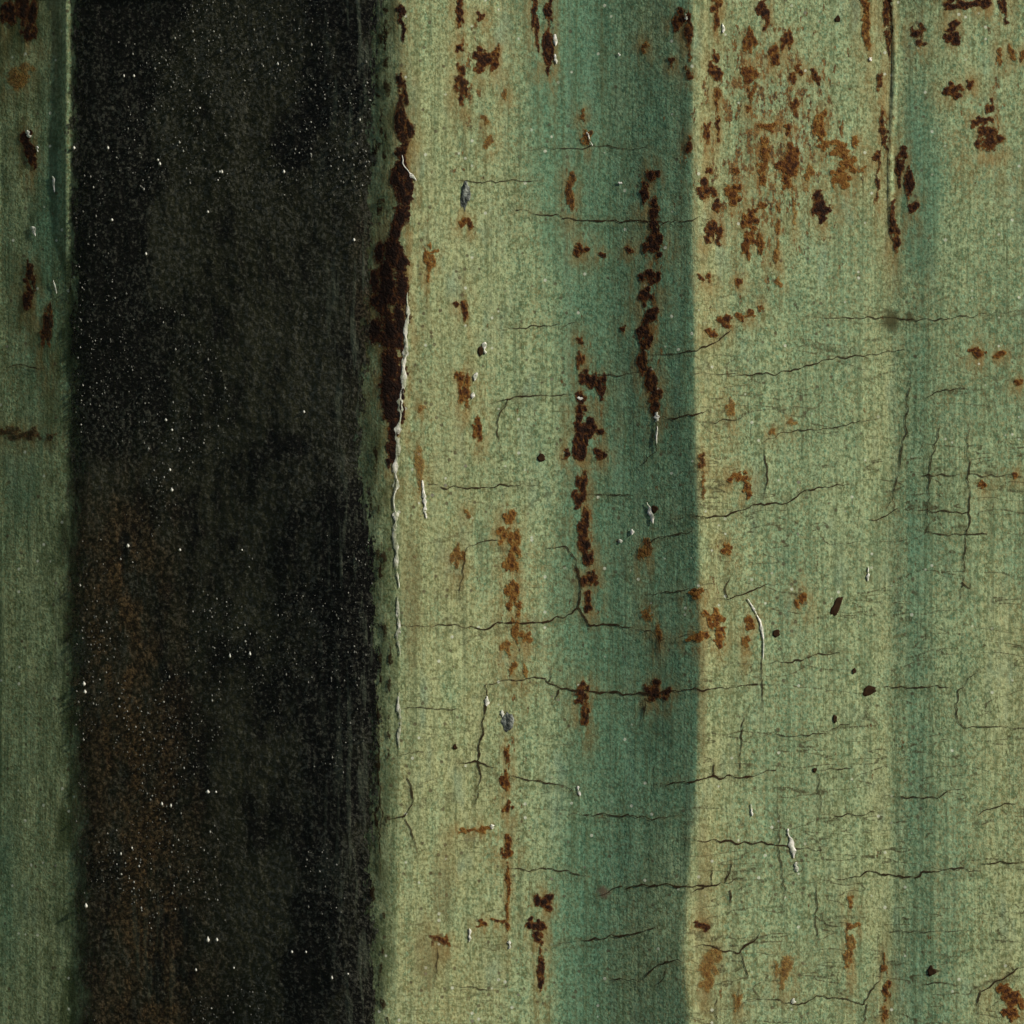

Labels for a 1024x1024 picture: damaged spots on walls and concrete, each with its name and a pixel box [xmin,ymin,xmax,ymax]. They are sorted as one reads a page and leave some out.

rust [454,43,500,106]
rust [531,0,555,76]
rust [943,0,1010,45]
rust [696,0,920,288]
rust [366,73,415,470]
crack [598,328,1011,600]
crack [402,539,692,651]
crack [463,652,849,911]
rust [524,893,555,992]
crack [704,930,961,1023]
crack [815,861,1018,936]
crack [927,964,1023,1006]